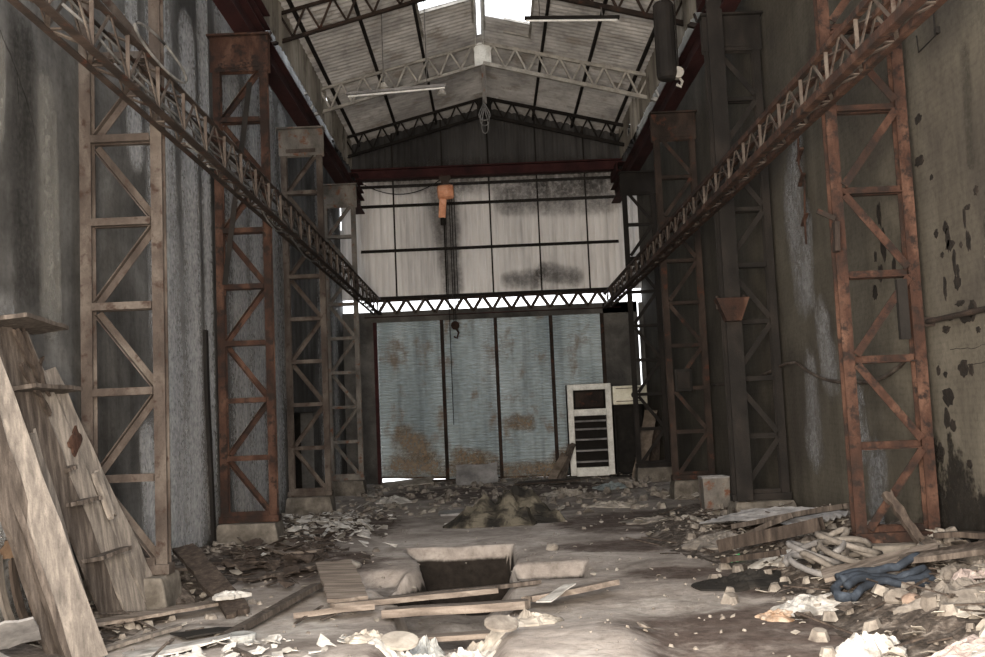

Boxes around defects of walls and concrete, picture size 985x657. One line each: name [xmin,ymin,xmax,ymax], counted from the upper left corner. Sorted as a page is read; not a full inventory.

leakage [0,25,61,333]
leakage [450,172,610,209]
leakage [785,128,838,466]
spalling [934,185,981,334]
rust [384,426,566,478]
leakage [934,432,985,543]
leakage [0,522,31,622]